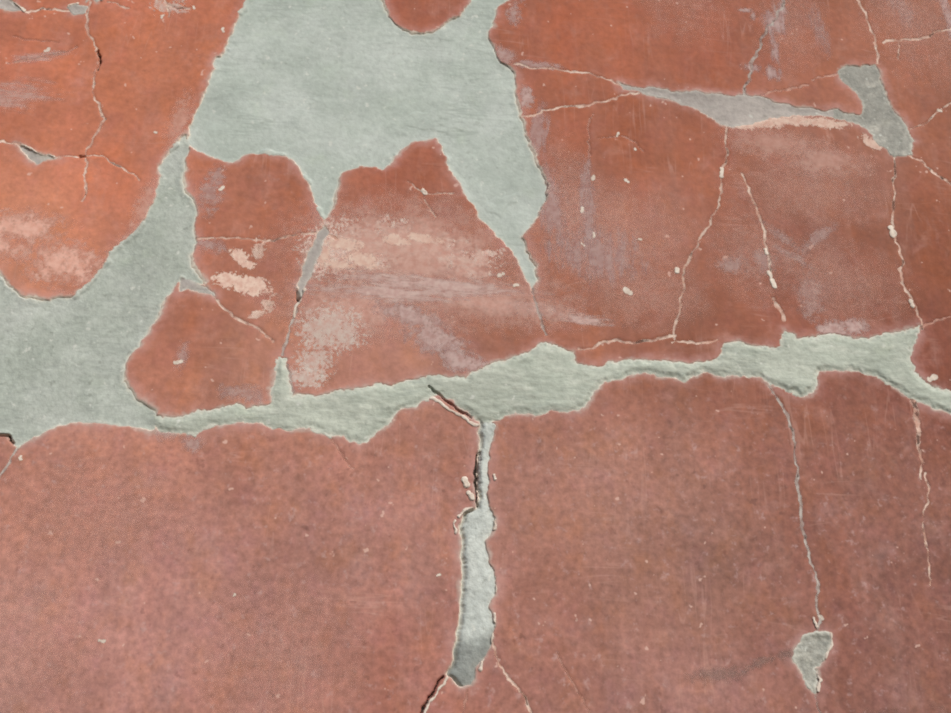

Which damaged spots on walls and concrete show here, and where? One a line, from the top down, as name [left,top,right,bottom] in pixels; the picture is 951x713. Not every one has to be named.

crack [7,1,140,202]
crack [513,63,643,151]
spalling [619,65,914,157]
crack [857,0,951,64]
spalling [0,0,547,460]
crack [577,126,786,350]
crack [888,155,951,330]
crack [0,436,18,476]
peeling [453,476,475,534]
crack [769,387,822,631]
crack [909,398,932,586]
spalling [792,615,833,694]